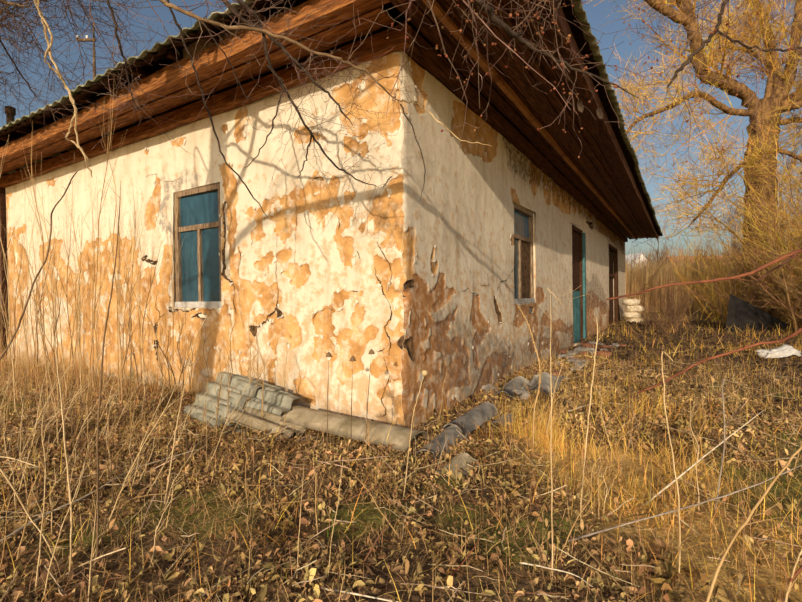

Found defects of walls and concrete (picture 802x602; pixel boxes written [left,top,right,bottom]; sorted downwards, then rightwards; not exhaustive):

flaking render [219,106,248,143]
flaking render [294,126,326,144]
flaking render [331,54,428,158]
flaking render [451,100,498,165]
flaking render [7,224,29,343]
flaking render [33,161,513,428]
crack [375,243,392,417]
flaking render [513,287,574,362]